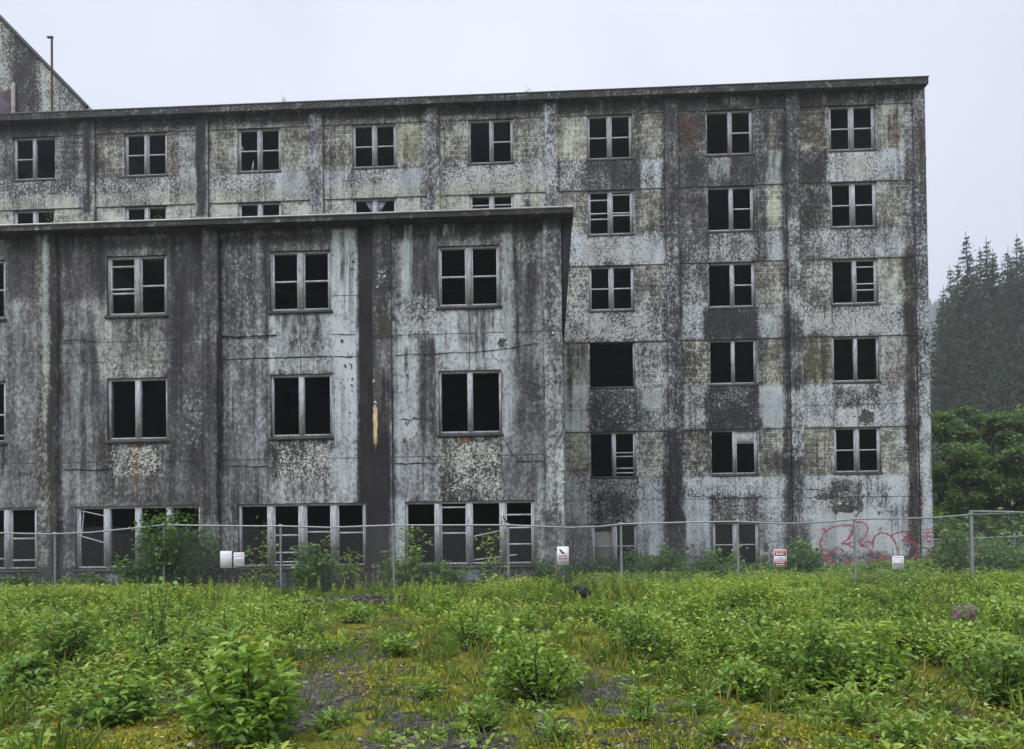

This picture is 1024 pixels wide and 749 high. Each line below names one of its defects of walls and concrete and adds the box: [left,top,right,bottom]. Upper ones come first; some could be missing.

damp [349,226,389,540]
spalling [372,367,383,449]